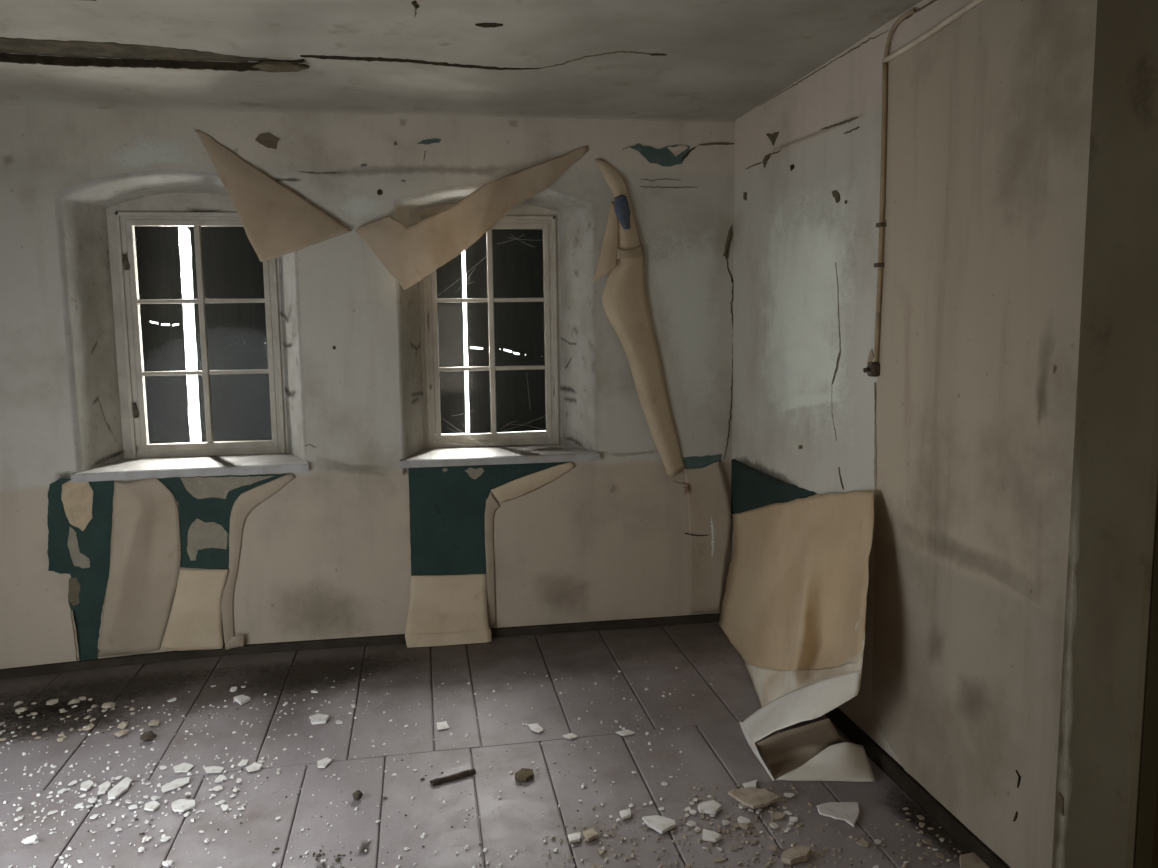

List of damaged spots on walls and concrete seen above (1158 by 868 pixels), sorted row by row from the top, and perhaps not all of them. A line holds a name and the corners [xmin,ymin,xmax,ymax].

crack [411,0,419,17]
crack [475,21,503,29]
crack [0,37,667,78]
spalling [255,132,281,149]
spalling [622,144,696,167]
crack [820,117,859,134]
crack [723,225,734,459]
crack [831,263,844,490]
peeling [683,454,818,614]
peeling [47,473,296,661]
peeling [405,462,575,648]